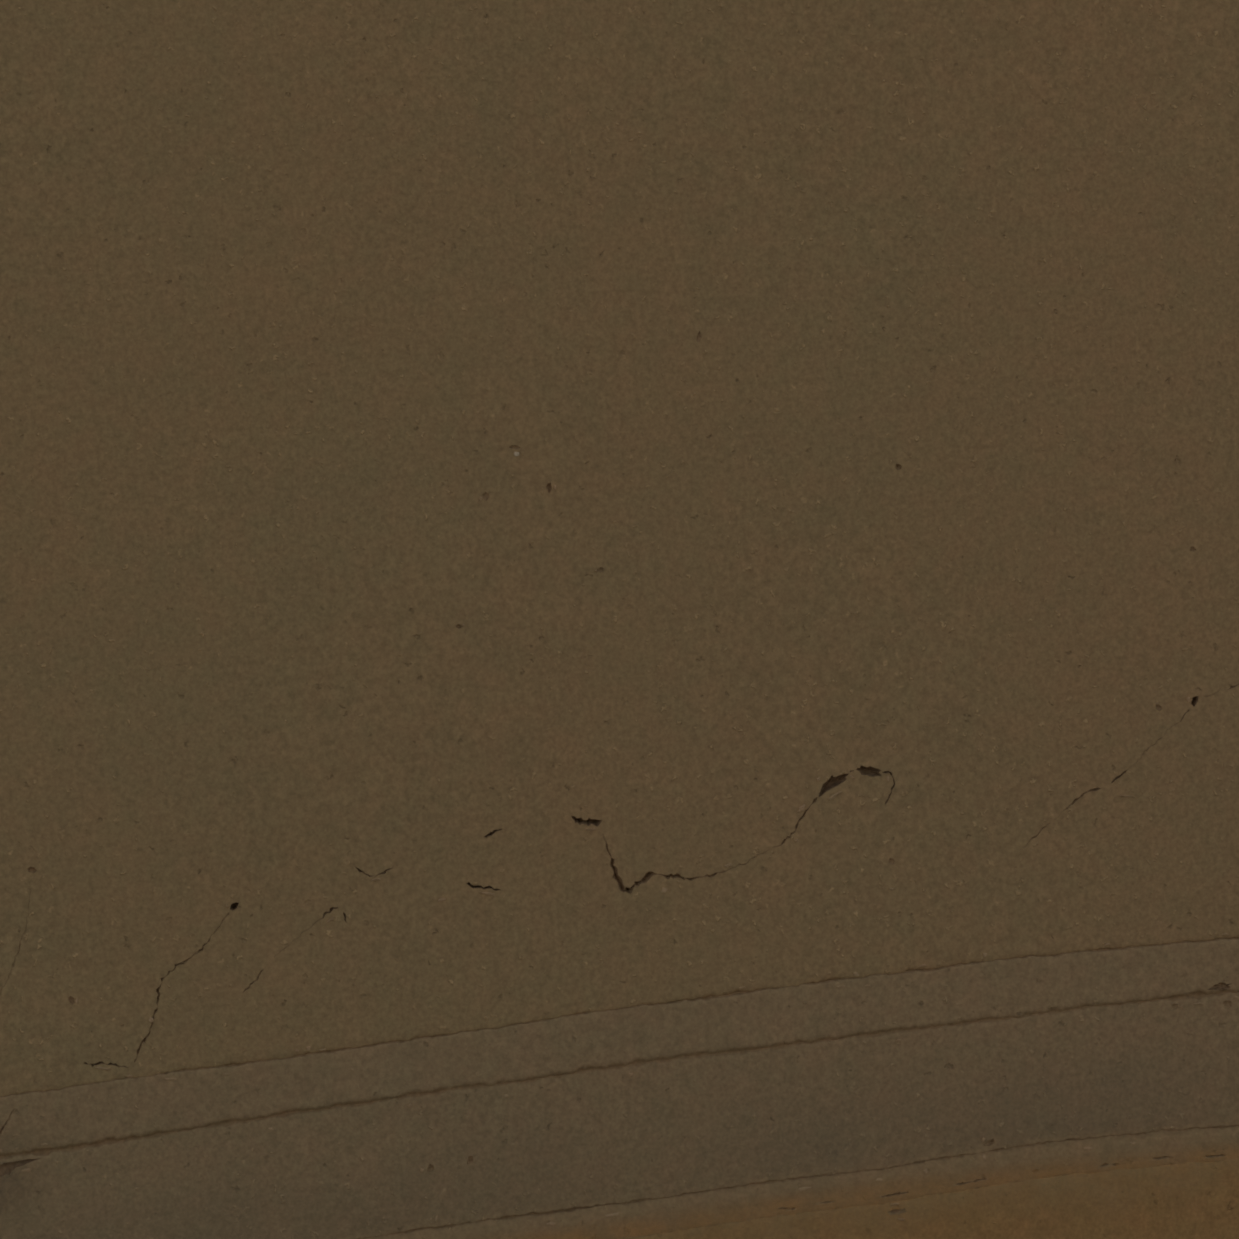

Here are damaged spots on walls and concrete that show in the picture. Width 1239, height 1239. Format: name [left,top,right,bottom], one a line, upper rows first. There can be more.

crack [571,765,895,894]
crack [1024,684,1239,848]
crack [0,891,1239,1159]
crack [357,1125,1239,1239]